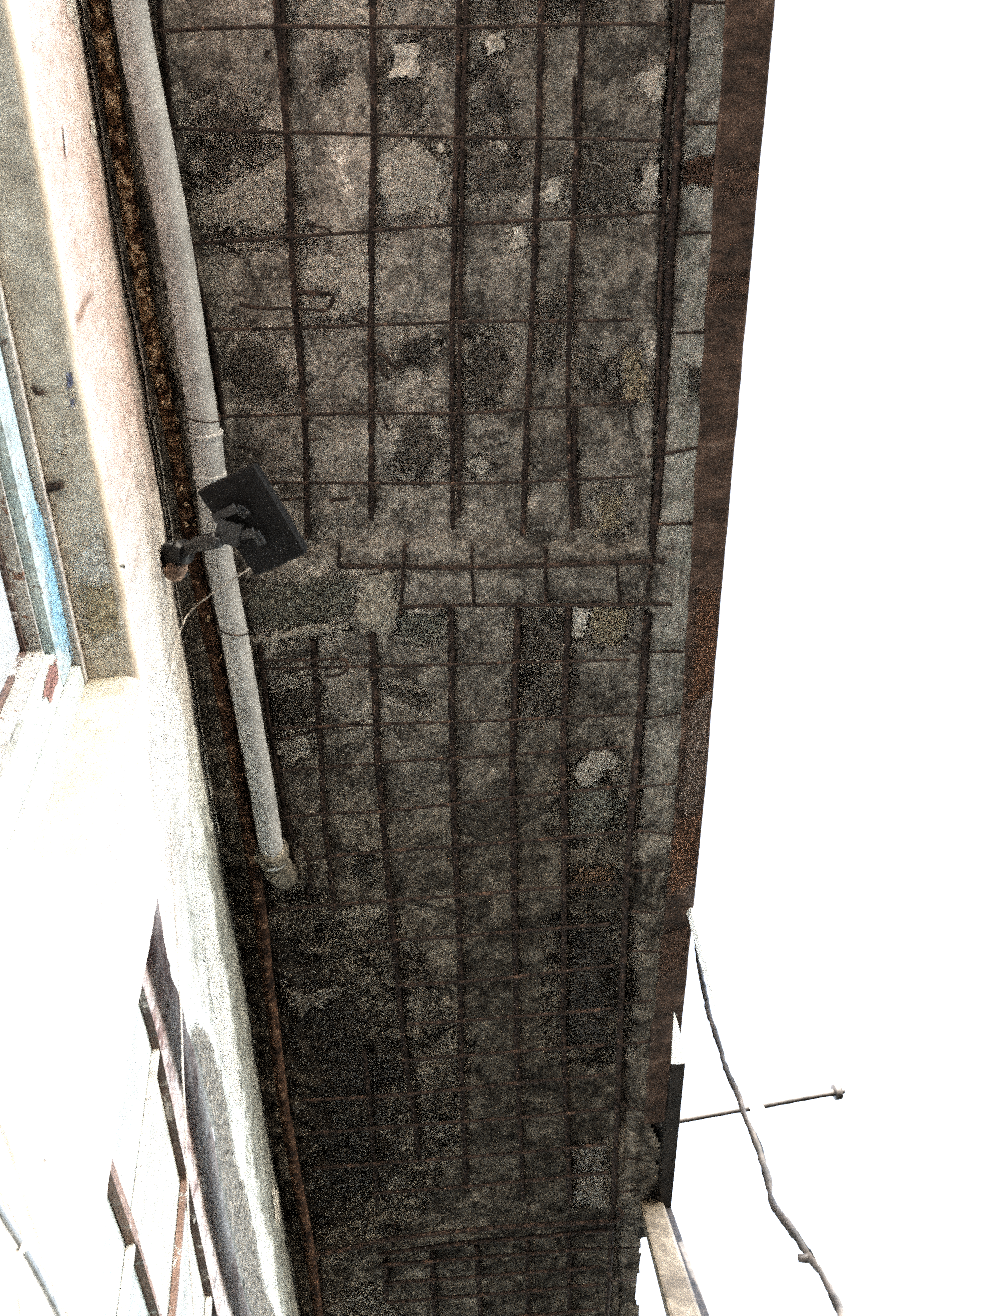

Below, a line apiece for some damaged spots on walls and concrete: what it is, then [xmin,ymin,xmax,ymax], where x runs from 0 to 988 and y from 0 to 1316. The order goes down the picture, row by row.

spalling [147,0,691,1316]
leakage [352,851,377,877]
leakage [567,782,625,835]
peeling [680,692,711,814]
leakage [554,919,621,1061]
leakage [254,927,418,1227]